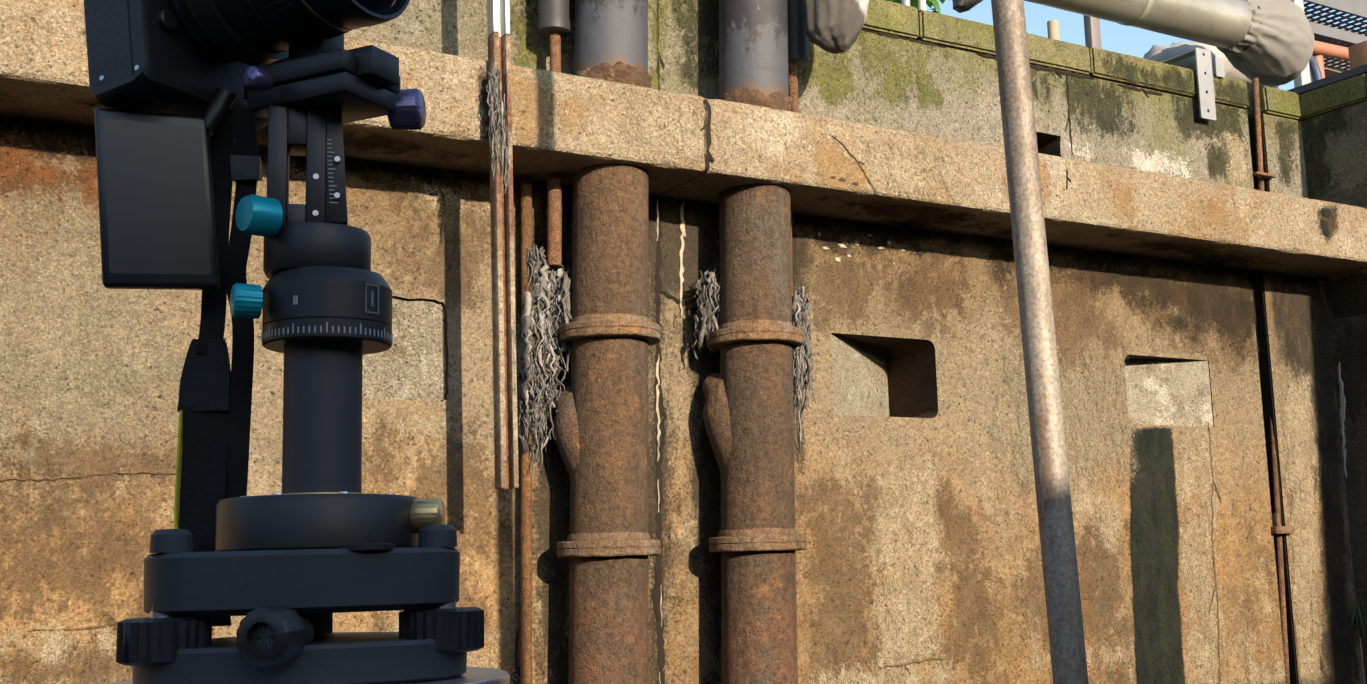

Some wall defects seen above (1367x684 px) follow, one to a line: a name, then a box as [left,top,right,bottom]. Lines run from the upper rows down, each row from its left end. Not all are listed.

rust [0,118,98,206]
crack [700,99,715,170]
water stain [1063,137,1092,162]
water stain [1122,148,1196,179]
water stain [1202,133,1252,226]
water stain [989,351,1035,490]
water stain [1061,274,1367,684]
crack [29,623,117,632]